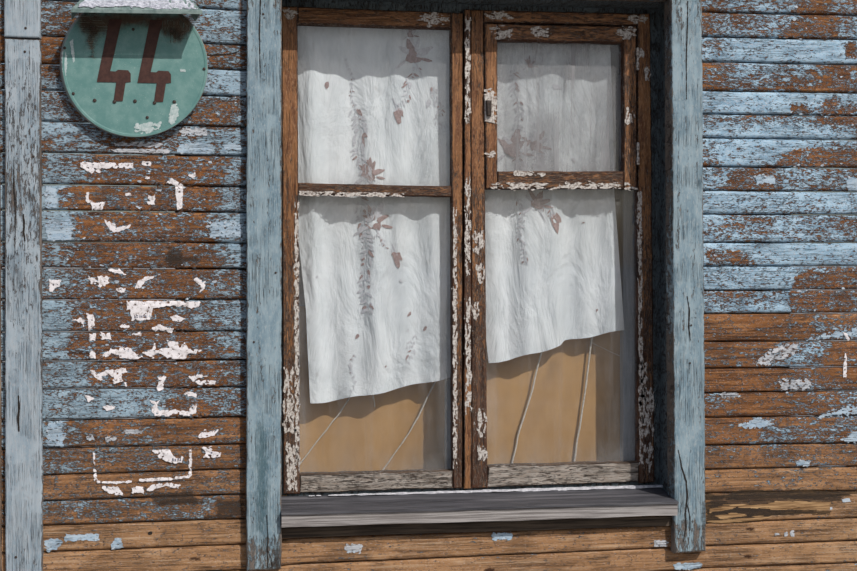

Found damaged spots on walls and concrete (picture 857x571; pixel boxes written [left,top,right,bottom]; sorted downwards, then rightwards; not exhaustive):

peeling [484,11,514,40]
peeling [778,0,833,41]
peeling [845,41,857,60]
peeling [790,94,857,126]
peeling [726,144,857,191]
peeling [44,104,226,419]
peeling [707,248,744,265]
peeling [788,269,857,314]
peeling [452,178,488,469]
peeling [490,170,656,473]
peeling [105,428,143,442]
crack [678,450,691,542]